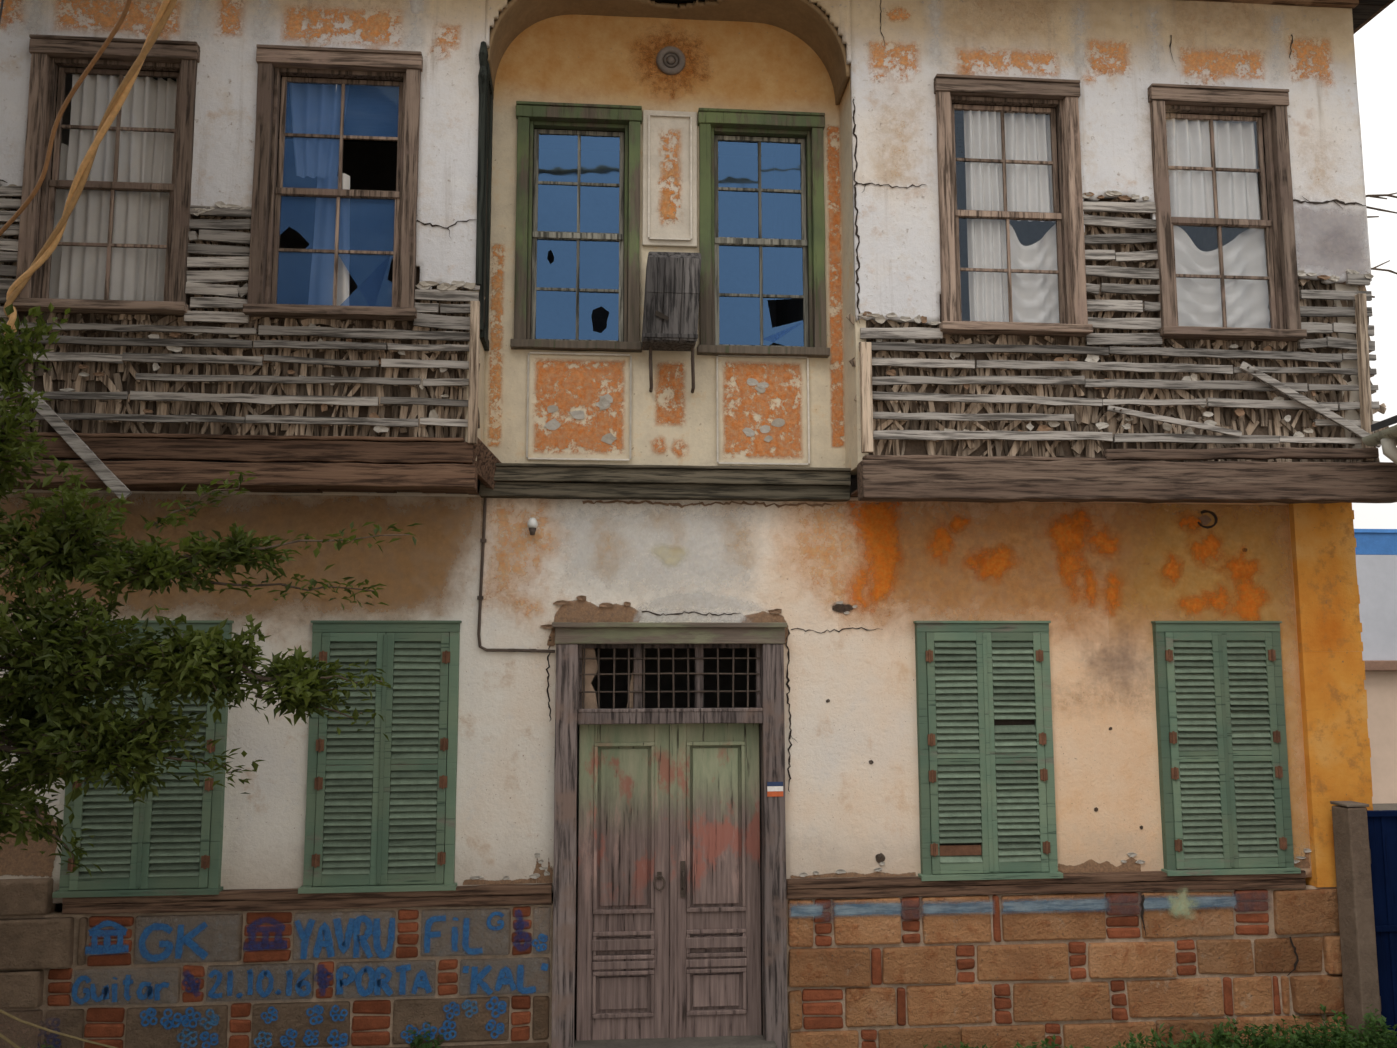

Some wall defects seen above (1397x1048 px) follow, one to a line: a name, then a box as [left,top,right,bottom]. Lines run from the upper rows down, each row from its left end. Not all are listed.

peeling [285,8,399,50]
peeling [958,50,1056,74]
peeling [1182,49,1262,84]
crack [1293,196,1366,209]
peeling [827,126,941,447]
peeling [534,360,623,453]
peeling [724,363,801,457]
peeling [798,501,903,614]
peeling [1162,510,1265,621]
crack [785,627,883,792]
flaking render [0,807,59,878]
crack [1287,937,1299,976]